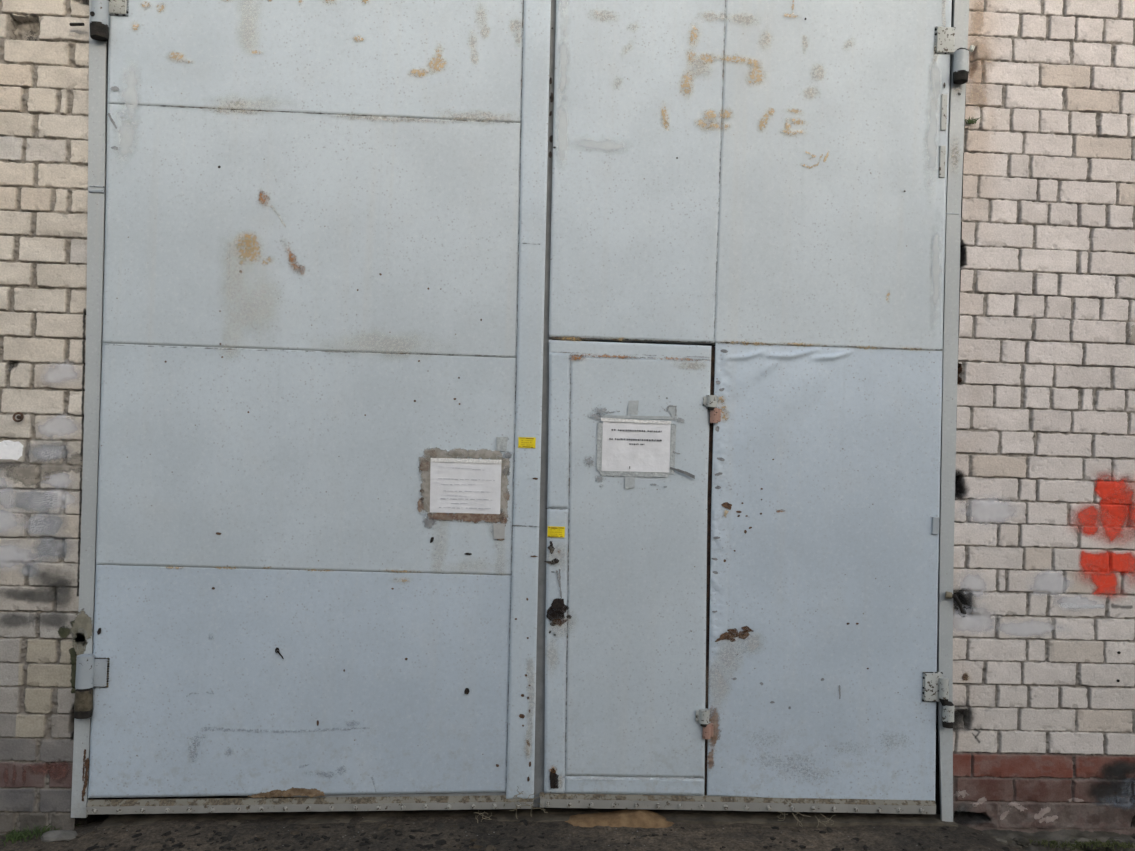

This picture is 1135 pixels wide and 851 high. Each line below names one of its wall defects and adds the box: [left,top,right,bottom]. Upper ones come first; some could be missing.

rust [412,50,445,77]
rust [681,28,762,94]
rust [707,709,720,769]